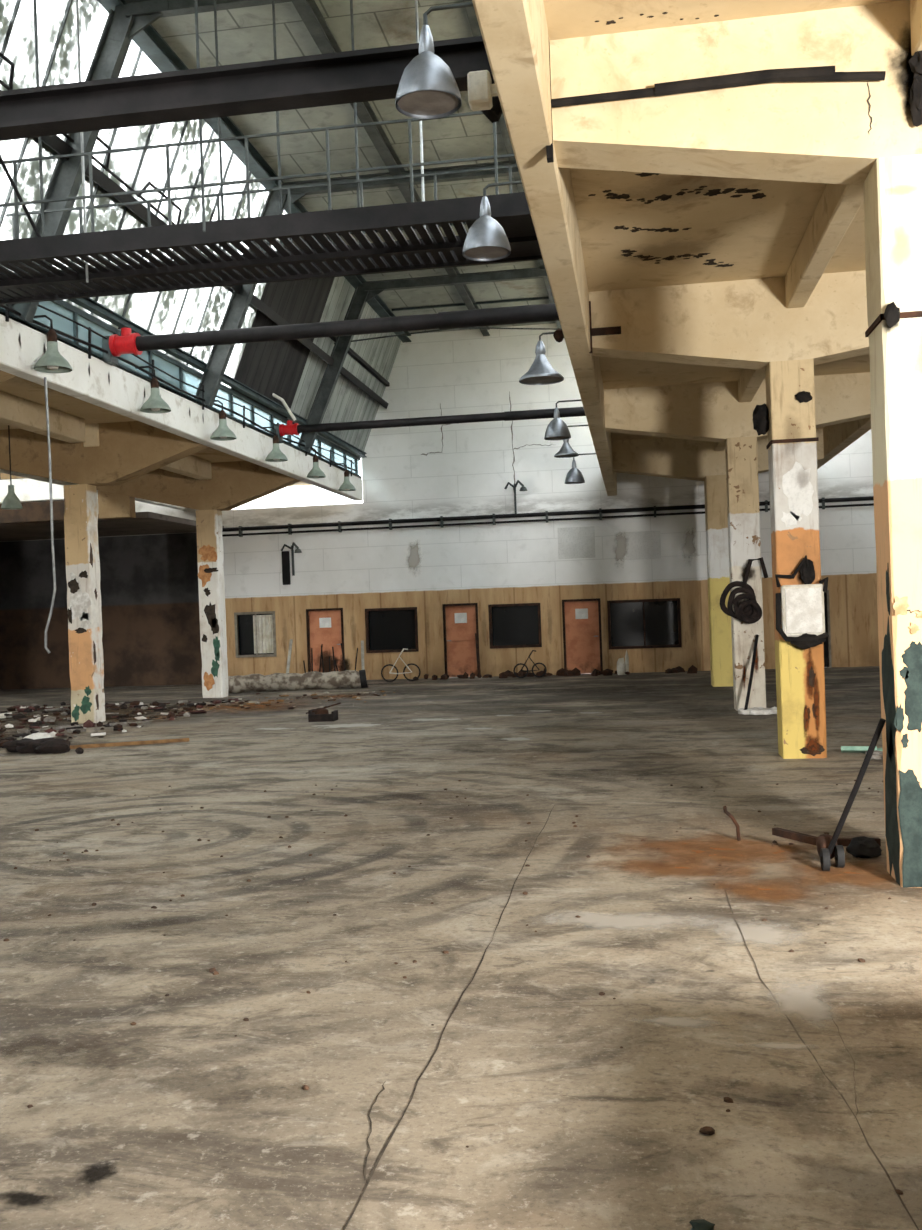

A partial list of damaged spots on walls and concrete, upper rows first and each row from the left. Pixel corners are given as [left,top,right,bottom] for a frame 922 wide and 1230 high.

peeling [68,543,97,665]
peeling [198,545,220,691]
peeling [72,685,99,721]
rust [804,651,819,753]
peeling [882,567,922,888]
rust [614,837,804,899]
rust [803,864,895,887]
crack [343,807,554,1230]